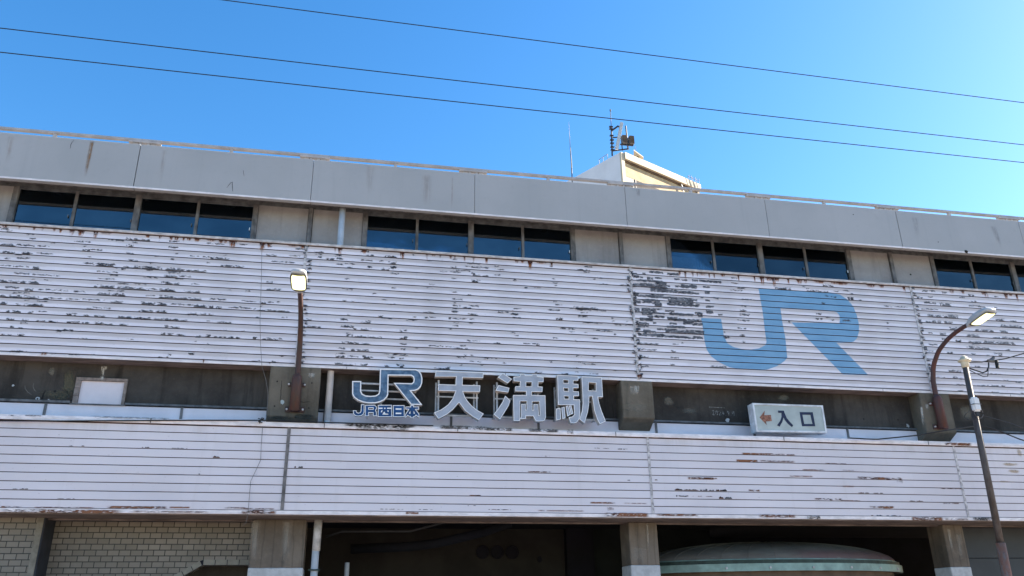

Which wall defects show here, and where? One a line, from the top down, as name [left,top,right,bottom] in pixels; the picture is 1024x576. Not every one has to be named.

peeling [0,227,289,355]
peeling [266,245,399,369]
peeling [384,284,505,370]
peeling [440,259,504,330]
peeling [542,270,752,377]
peeling [804,284,861,322]
peeling [884,287,1024,394]
rust [737,453,794,462]